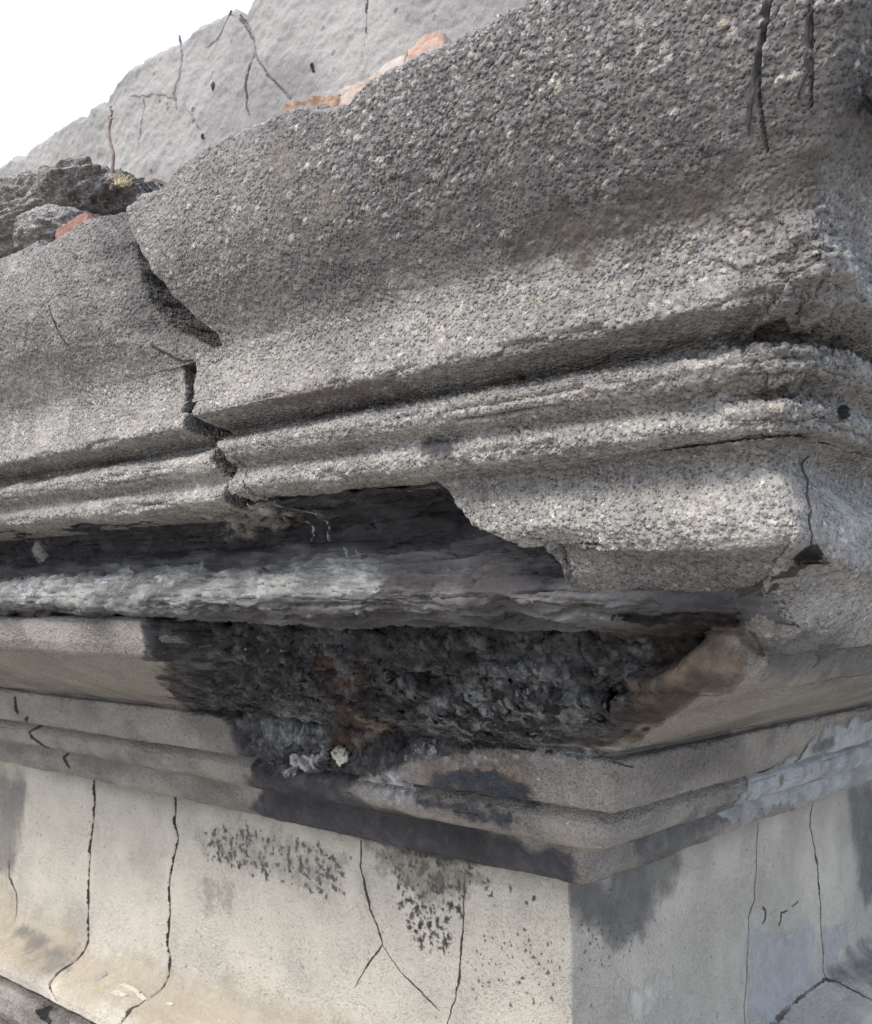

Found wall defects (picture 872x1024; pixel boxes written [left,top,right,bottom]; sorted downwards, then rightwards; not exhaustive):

crack [129,10,292,144]
crack [746,0,773,136]
spalling [141,617,730,778]
crack [49,780,96,1002]
crack [121,797,179,1024]
water stain [204,823,352,900]
water stain [359,771,426,805]
crack [354,840,466,1024]
water stain [376,850,493,957]
water stain [476,928,564,1006]
water stain [568,804,730,1014]
crack [744,802,871,1024]